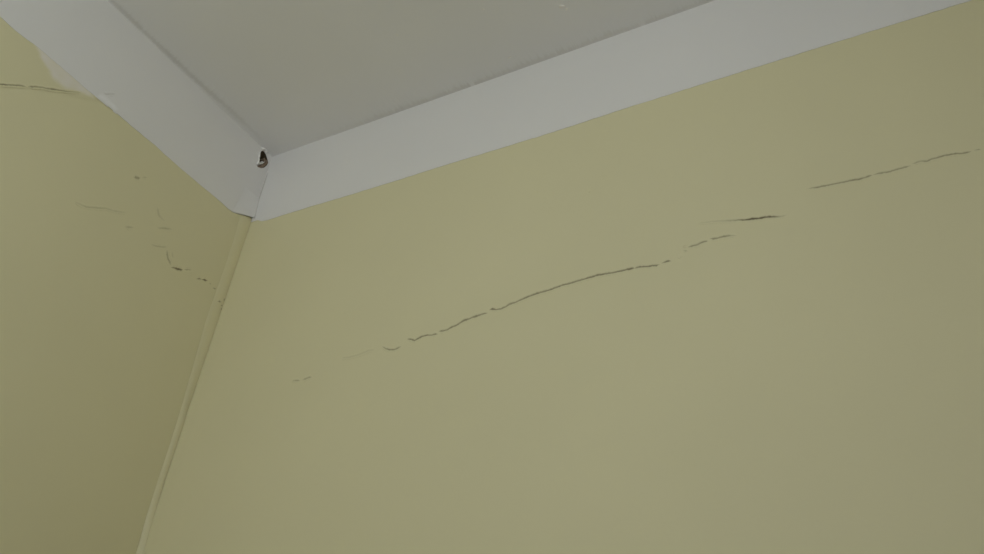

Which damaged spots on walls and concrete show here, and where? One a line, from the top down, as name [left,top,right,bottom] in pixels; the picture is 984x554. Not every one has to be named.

crack [806,147,981,190]
crack [150,243,216,291]
crack [342,213,787,360]